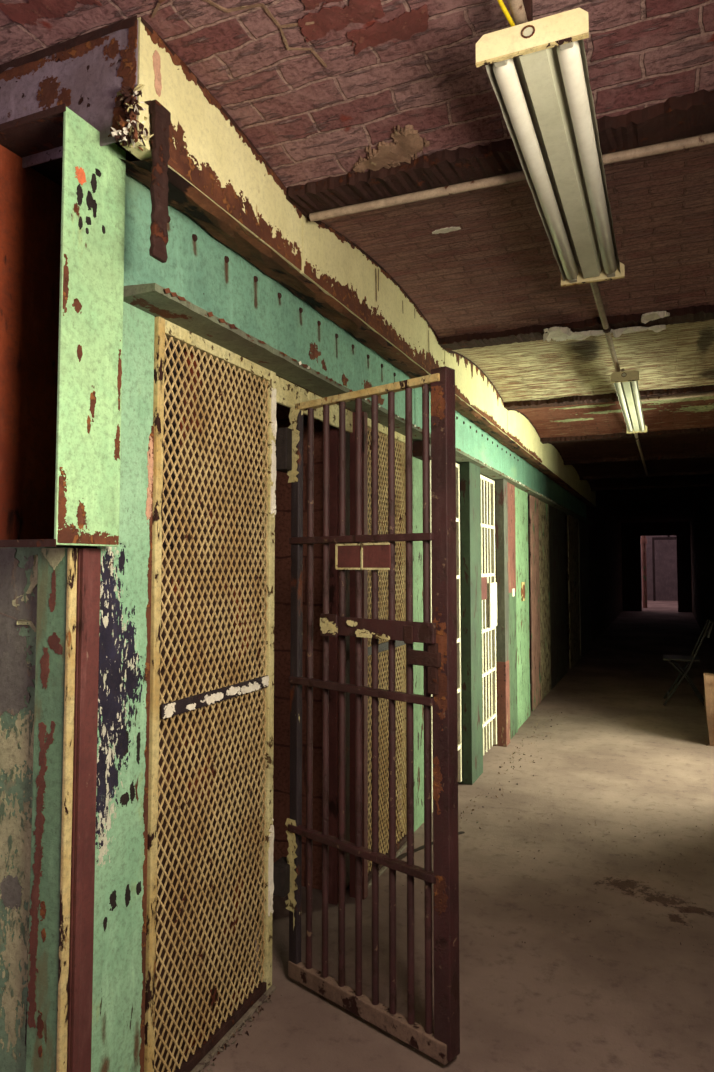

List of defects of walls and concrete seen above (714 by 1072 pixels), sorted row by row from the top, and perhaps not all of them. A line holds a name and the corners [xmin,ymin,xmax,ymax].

corrosion [0,15,138,137]
peeling [75,166,105,234]
peeling [145,26,444,374]
peeling [0,548,65,1059]
corrosion [27,721,56,1057]
peeling [95,543,146,867]
peeling [103,881,142,931]
peeling [163,676,269,719]